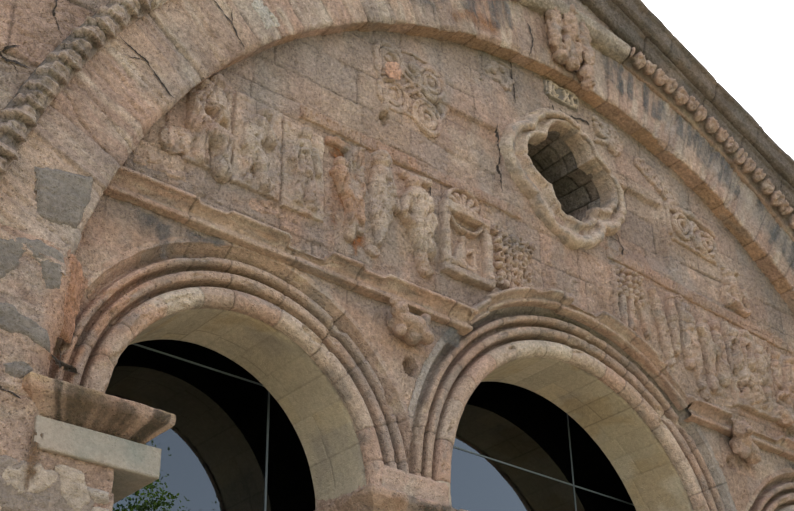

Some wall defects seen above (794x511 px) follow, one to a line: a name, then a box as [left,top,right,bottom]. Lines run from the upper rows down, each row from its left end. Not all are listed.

crack [52,0,70,34]
crack [122,39,174,98]